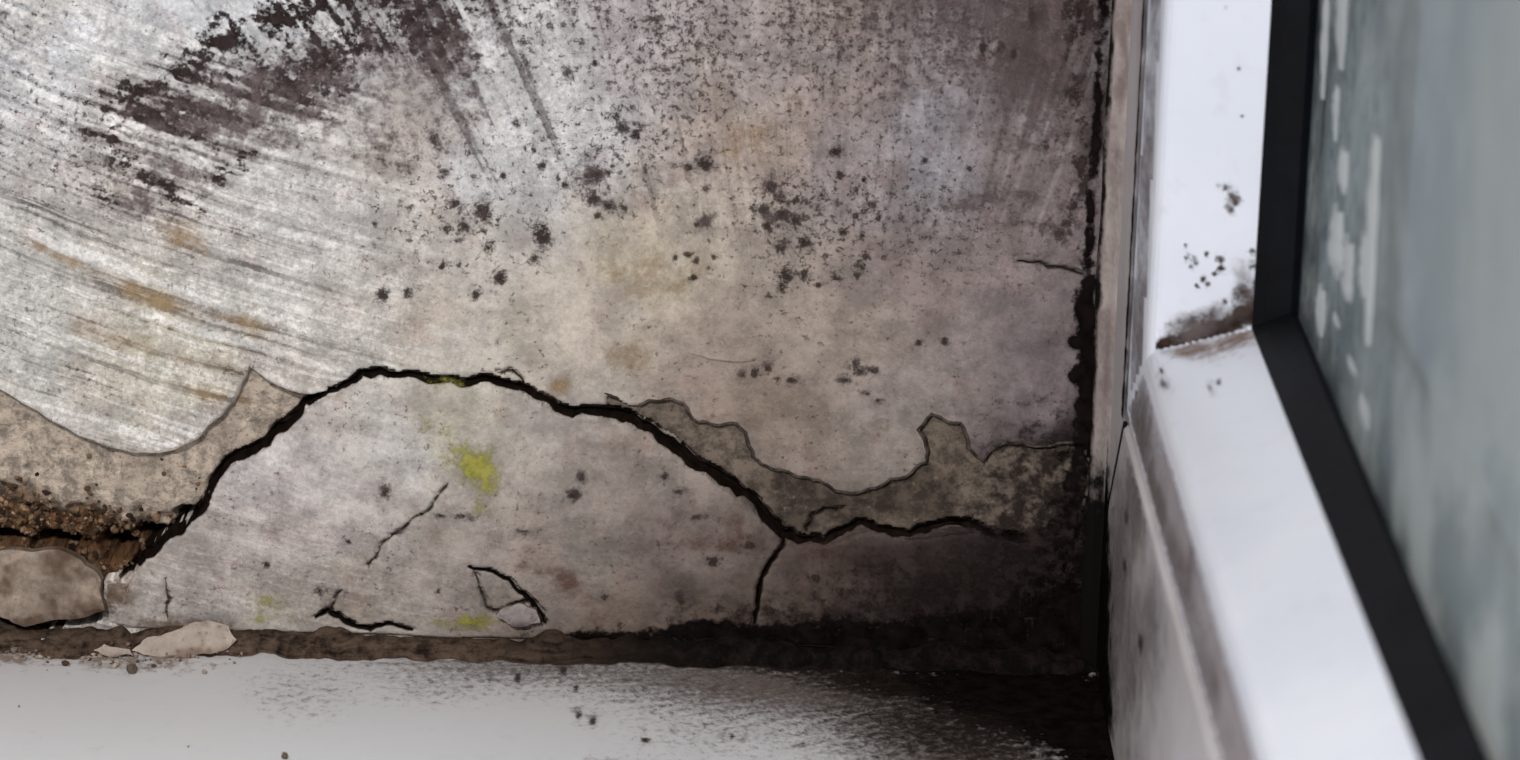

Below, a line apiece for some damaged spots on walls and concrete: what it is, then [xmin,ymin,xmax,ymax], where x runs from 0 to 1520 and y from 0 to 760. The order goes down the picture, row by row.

leakage [1184,243,1225,288]
leakage [0,0,1127,760]
flaking render [0,361,328,583]
crack [119,366,1043,624]
peeling [605,393,1089,536]
peeling [94,644,133,657]
crack [315,590,413,631]